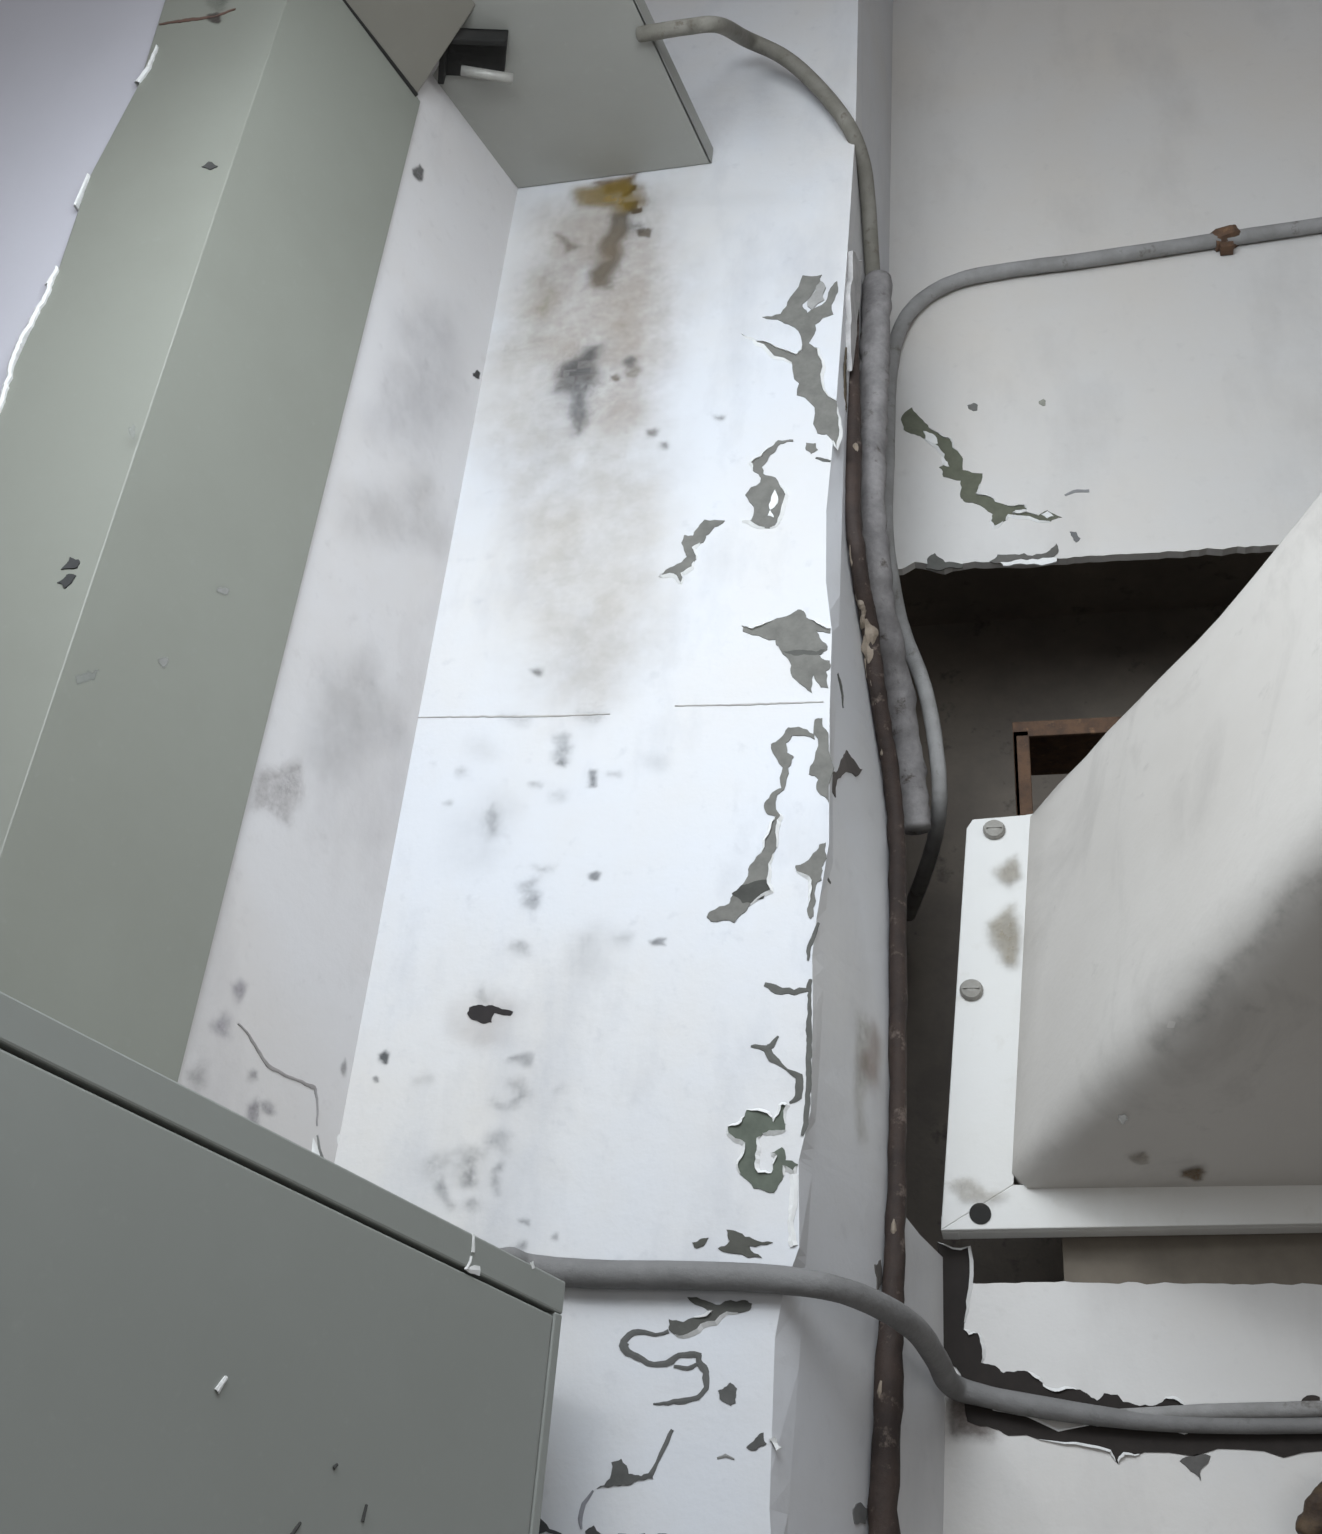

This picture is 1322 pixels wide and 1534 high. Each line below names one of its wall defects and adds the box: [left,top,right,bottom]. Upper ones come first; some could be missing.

leakage [413,166,423,180]
rust [578,175,634,210]
leakage [591,211,651,286]
leakage [560,349,595,420]
peeling [658,251,862,585]
peeling [901,408,1080,567]
peeling [742,609,844,708]
peeling [707,718,862,923]
crack [237,1023,319,1126]
peeling [692,1102,798,1258]
flaking render [937,1242,1185,1409]
flaking render [951,1399,1322,1479]